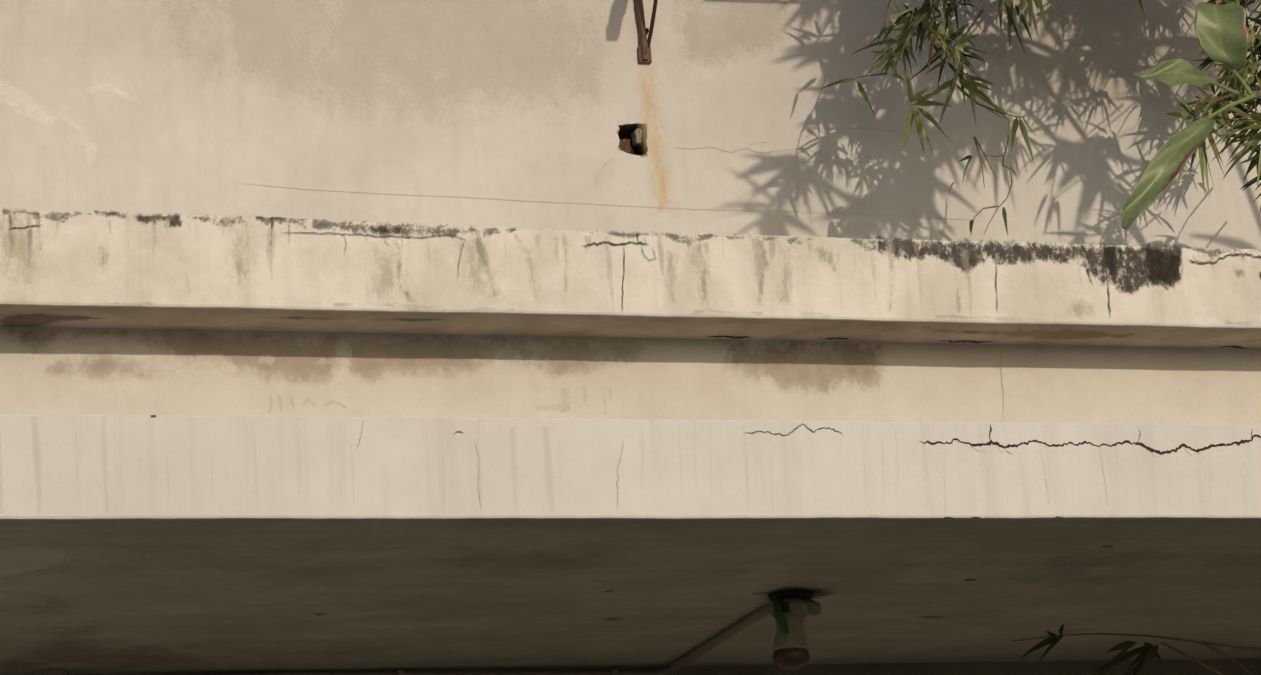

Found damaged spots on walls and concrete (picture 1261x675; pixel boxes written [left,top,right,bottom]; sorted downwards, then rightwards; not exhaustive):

hole [617,123,648,157]
rust [646,87,669,209]
water stain [2,209,515,266]
water stain [592,231,743,300]
water stain [851,236,1239,304]
water stain [0,313,127,349]
water stain [47,352,156,378]
water stain [146,333,638,382]
water stain [730,342,879,392]
crack [919,340,1261,458]
crack [746,423,843,436]